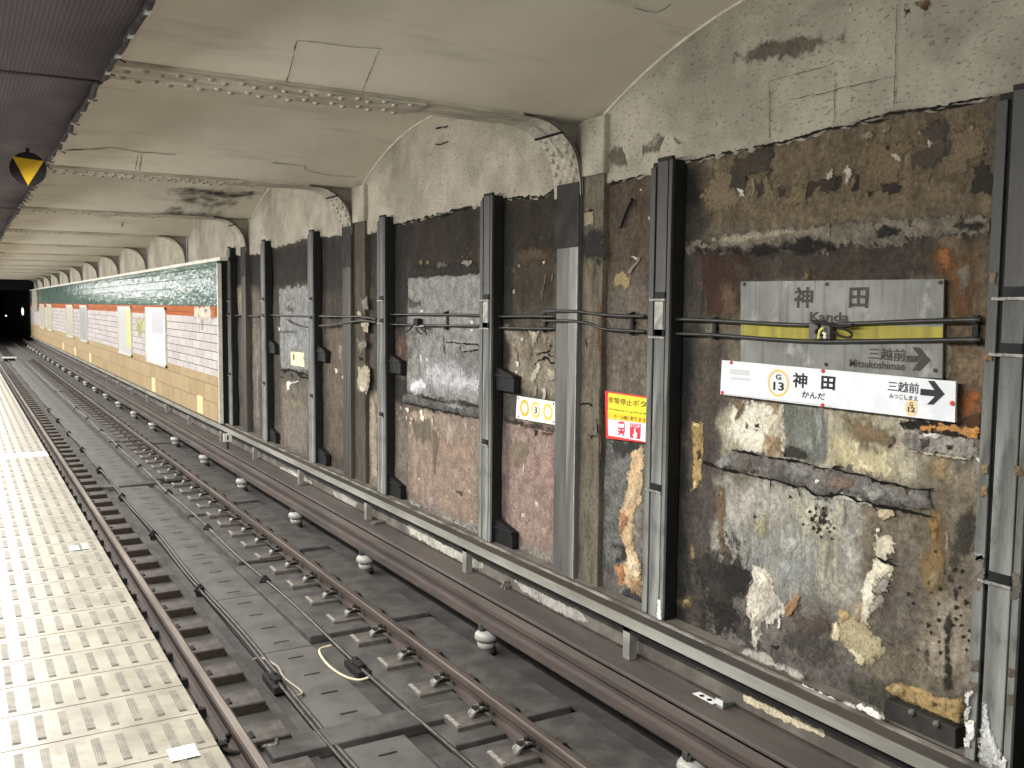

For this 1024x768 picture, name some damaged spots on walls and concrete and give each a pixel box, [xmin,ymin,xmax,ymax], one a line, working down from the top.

damp [736,36,822,63]
crack [67,147,170,170]
damp [609,146,627,166]
damp [642,134,680,156]
peeling [824,119,991,196]
rust [930,246,974,379]
peeling [356,297,378,482]
peeling [723,399,788,459]
peeling [614,445,645,597]
crack [701,449,935,518]
peeling [746,562,800,650]
peeling [830,493,896,668]